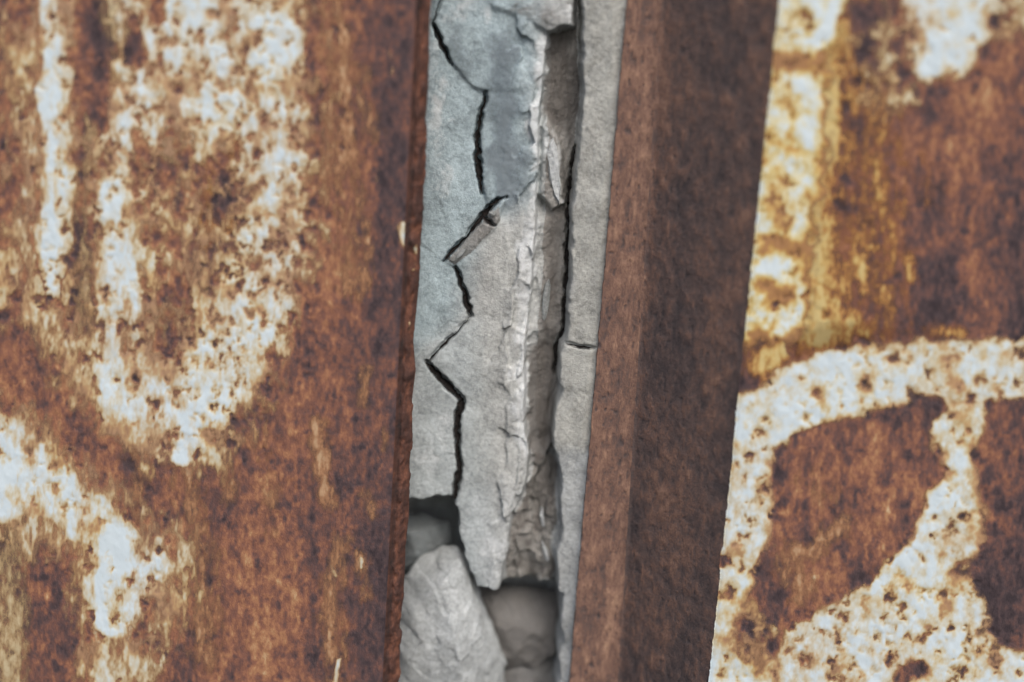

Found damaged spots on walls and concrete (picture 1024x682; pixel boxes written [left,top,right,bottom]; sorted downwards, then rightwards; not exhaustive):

rust [102,0,129,78]
crack [433,0,450,61]
rust [73,117,97,337]
rust [312,0,379,301]
crack [425,93,502,499]
crack [554,149,592,370]
rust [747,18,916,383]
rust [0,521,33,682]
rust [171,463,224,672]
rust [309,416,338,510]
rust [319,536,372,667]
rust [776,514,850,606]